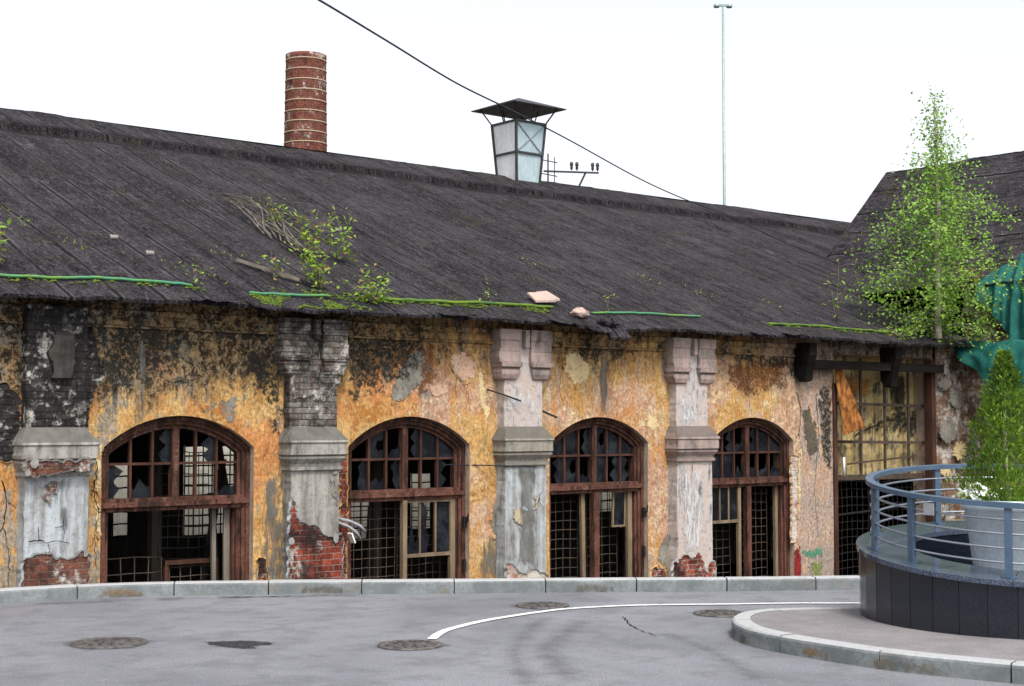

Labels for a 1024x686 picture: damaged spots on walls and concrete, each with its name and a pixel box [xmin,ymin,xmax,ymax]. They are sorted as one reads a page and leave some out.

spalling [86,327,106,429]
leakage [92,328,201,415]
leakage [215,332,284,434]
leakage [348,336,425,401]
spalling [0,381,105,539]
spalling [19,550,92,587]
spalling [255,453,350,581]
spalling [650,534,717,577]